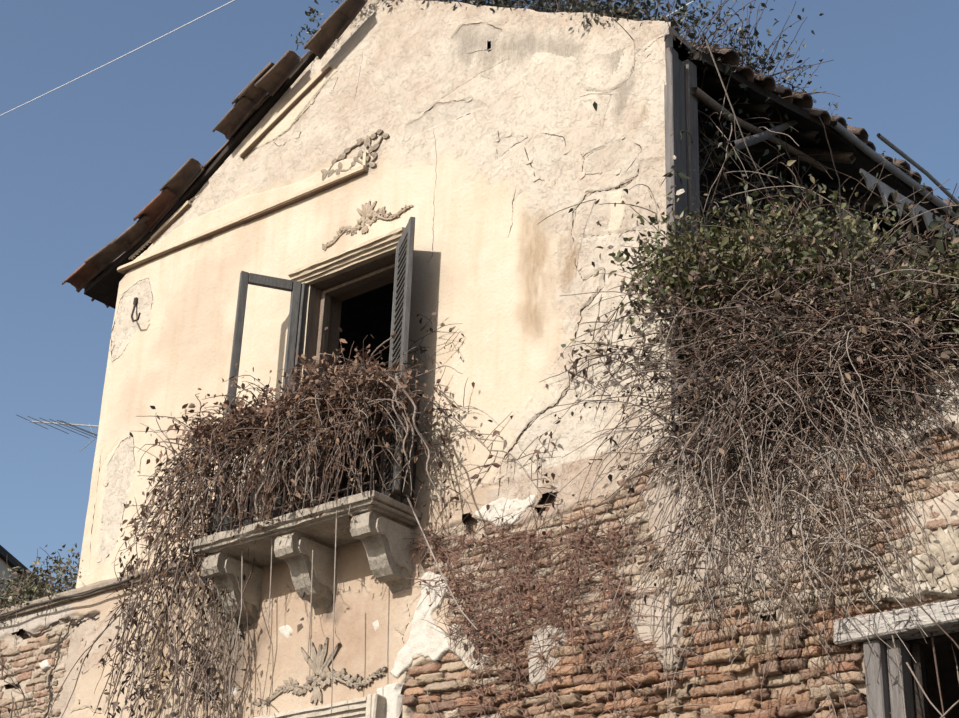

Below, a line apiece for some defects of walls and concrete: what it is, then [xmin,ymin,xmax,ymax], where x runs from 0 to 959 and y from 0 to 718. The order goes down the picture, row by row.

crack [420,58,510,263]
peeling [109,277,154,363]
crack [492,160,649,486]